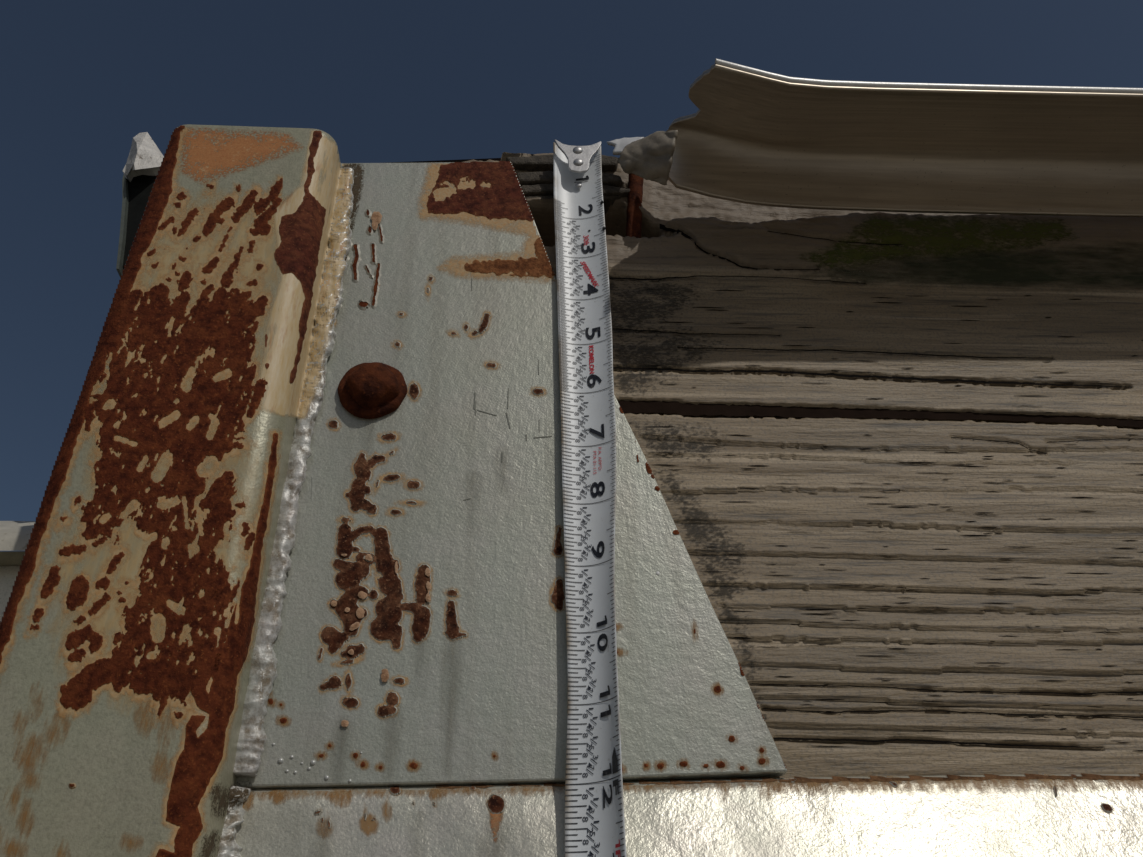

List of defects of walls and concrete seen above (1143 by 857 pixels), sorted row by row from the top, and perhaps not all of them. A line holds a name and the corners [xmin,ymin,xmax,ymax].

corrosion [419,161,557,296]
corrosion [0,125,353,857]
corrosion [318,432,468,710]
corrosion [352,753,384,771]
corrosion [360,787,394,835]
corrosion [622,747,1143,798]